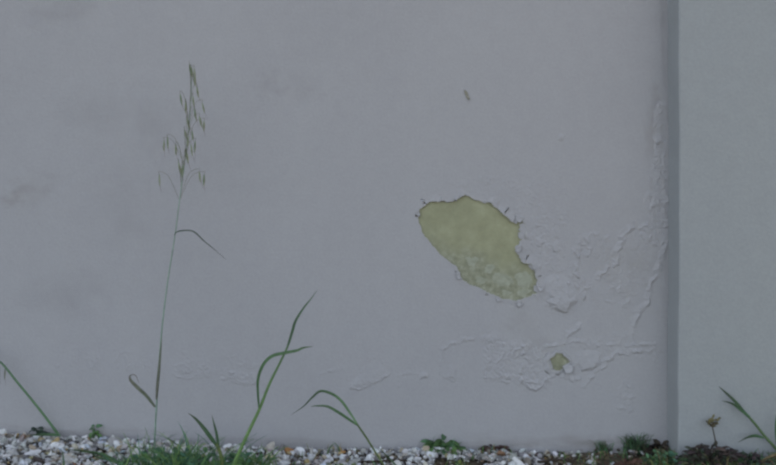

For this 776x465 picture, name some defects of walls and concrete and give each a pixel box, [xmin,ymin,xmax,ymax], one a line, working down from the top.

peeling [415,189,544,307]
peeling [543,350,574,375]